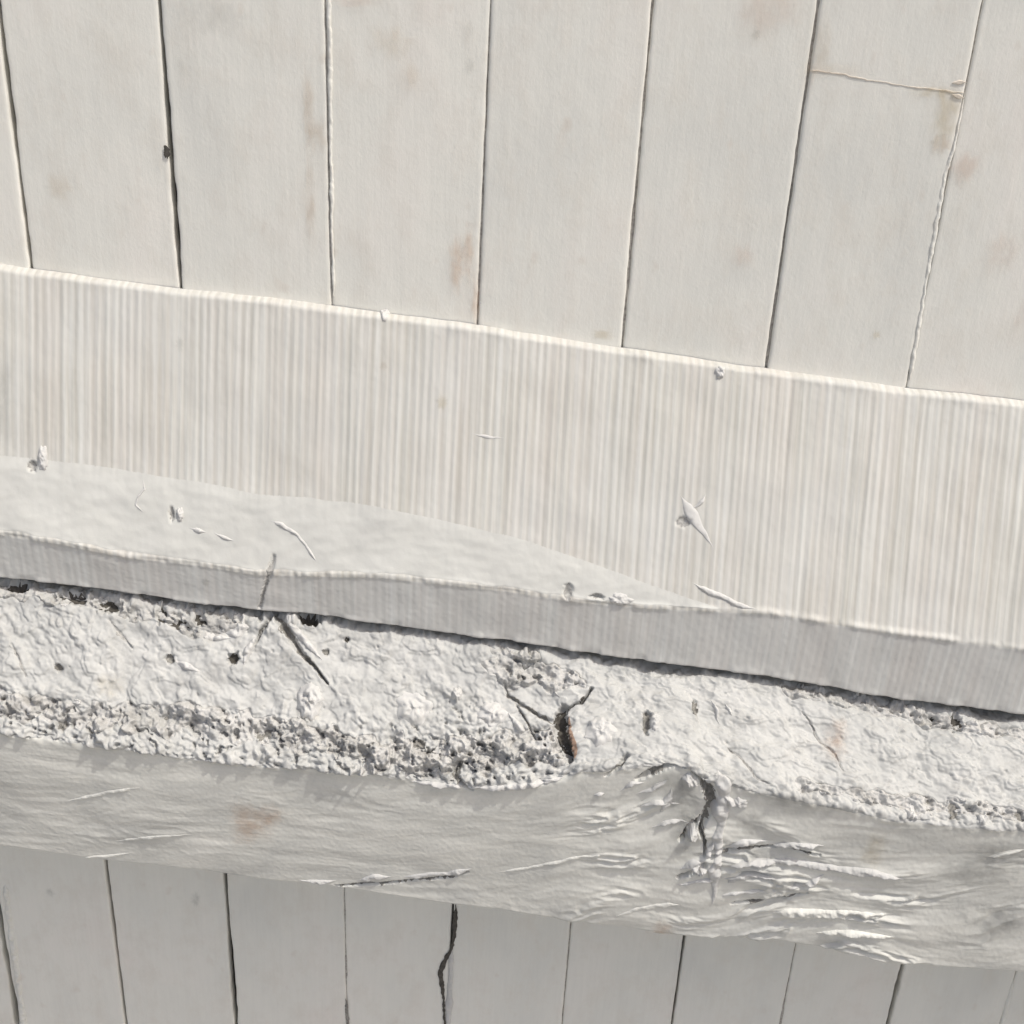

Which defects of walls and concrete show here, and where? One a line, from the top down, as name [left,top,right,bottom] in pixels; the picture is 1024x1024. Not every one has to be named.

spalling [0,579,237,641]
crack [255,559,325,681]
spalling [481,645,587,694]
spalling [0,685,566,780]
crack [505,687,590,761]
spalling [781,683,1024,744]
crack [680,778,812,855]
spalling [795,777,1024,822]
crack [734,893,796,904]